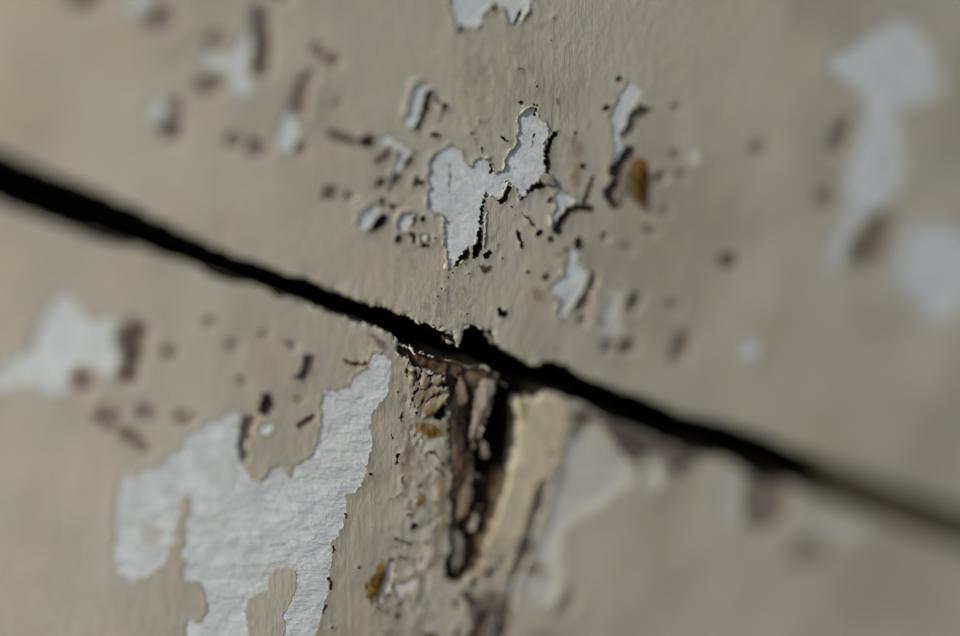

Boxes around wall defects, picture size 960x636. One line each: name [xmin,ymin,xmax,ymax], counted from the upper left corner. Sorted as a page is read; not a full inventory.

peeling [445,0,531,33]
peeling [346,76,654,297]
peeling [542,237,649,360]
crack [0,150,960,549]
hole [433,405,447,421]
peeling [110,352,399,636]
crack [368,493,417,561]
peeling [374,559,418,619]
spalling [452,567,499,611]